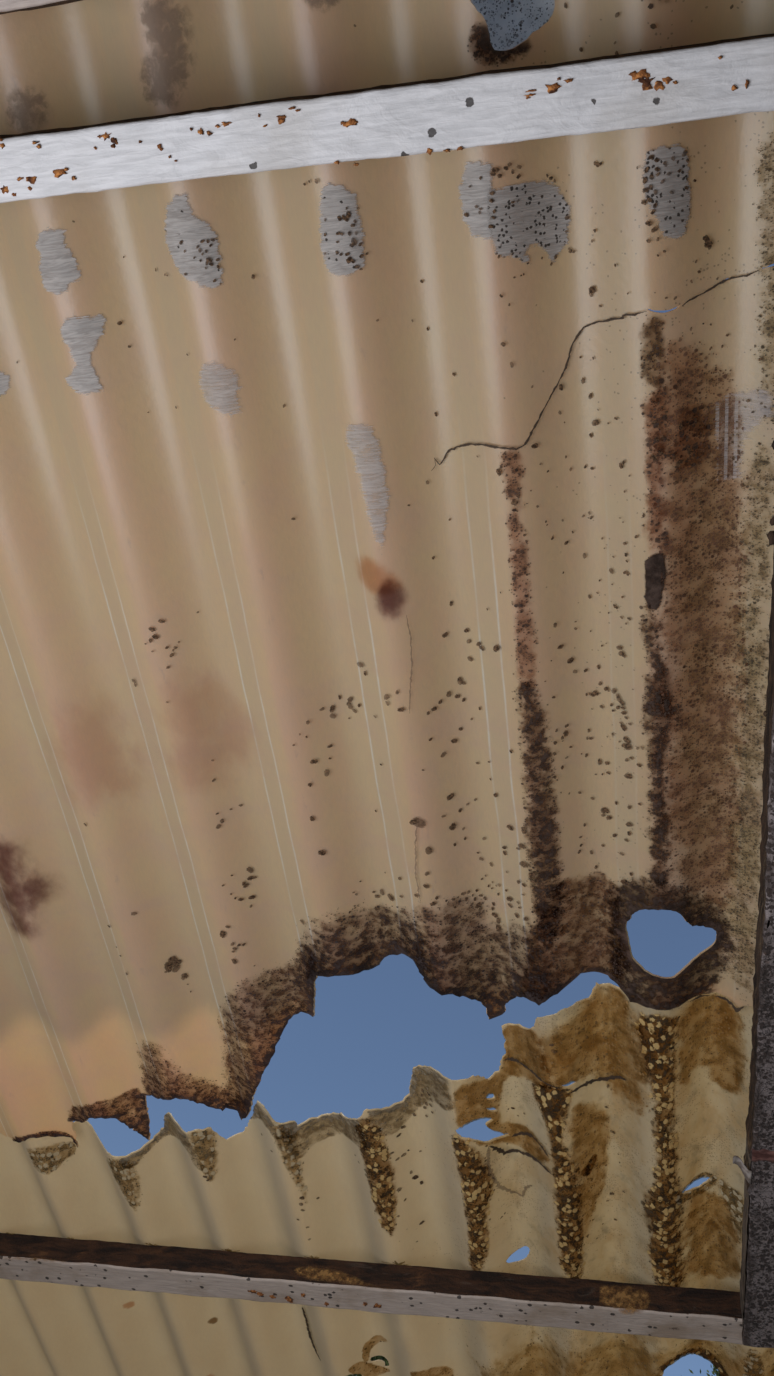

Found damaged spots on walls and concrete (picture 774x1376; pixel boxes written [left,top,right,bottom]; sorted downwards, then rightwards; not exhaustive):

crack [682,270,759,306]
crack [431,311,647,471]
leakage [12,141,774,1147]
leakage [0,847,42,932]
crack [503,1057,626,1093]
crack [486,1131,551,1197]